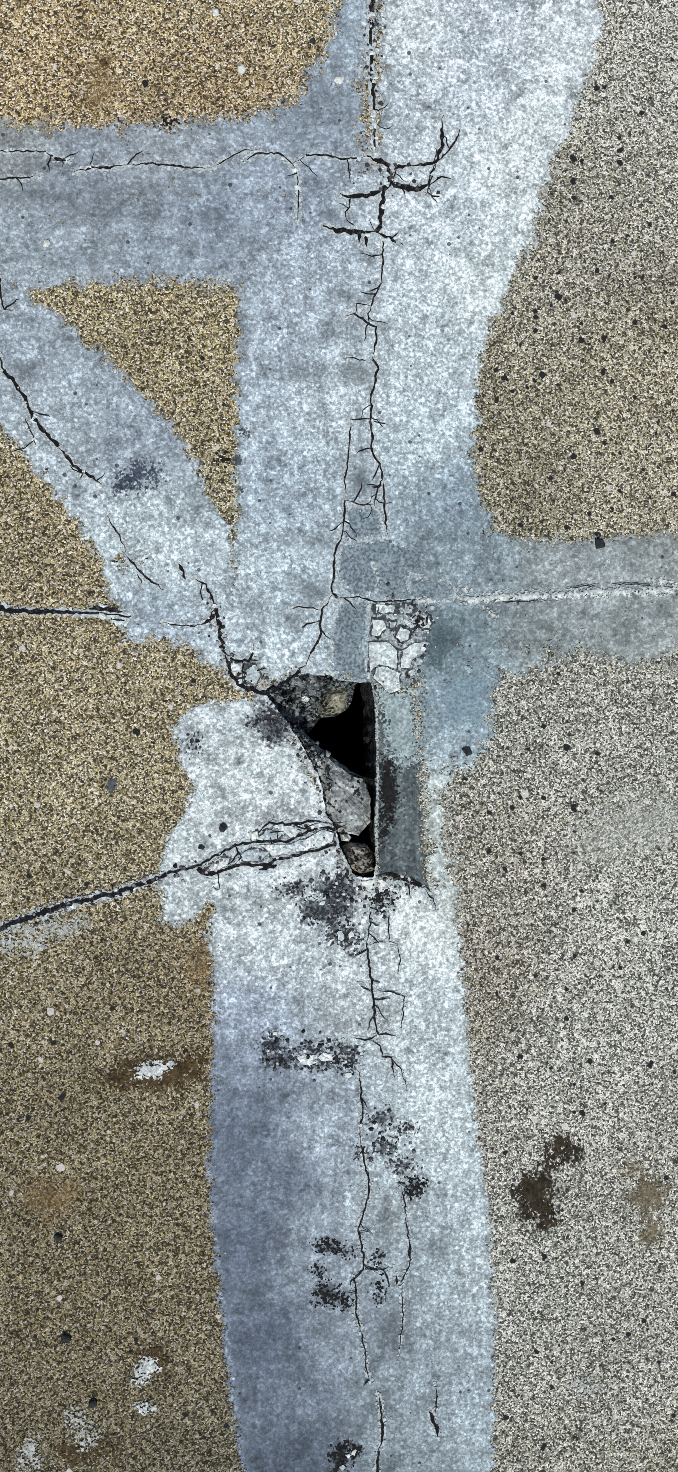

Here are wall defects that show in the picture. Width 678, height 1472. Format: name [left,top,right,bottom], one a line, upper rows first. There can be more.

crack [0,0,465,700]
crack [0,816,347,934]
spalling [180,732,209,760]
peeling [245,503,459,956]
crack [348,877,441,1472]
leakage [508,1130,585,1234]